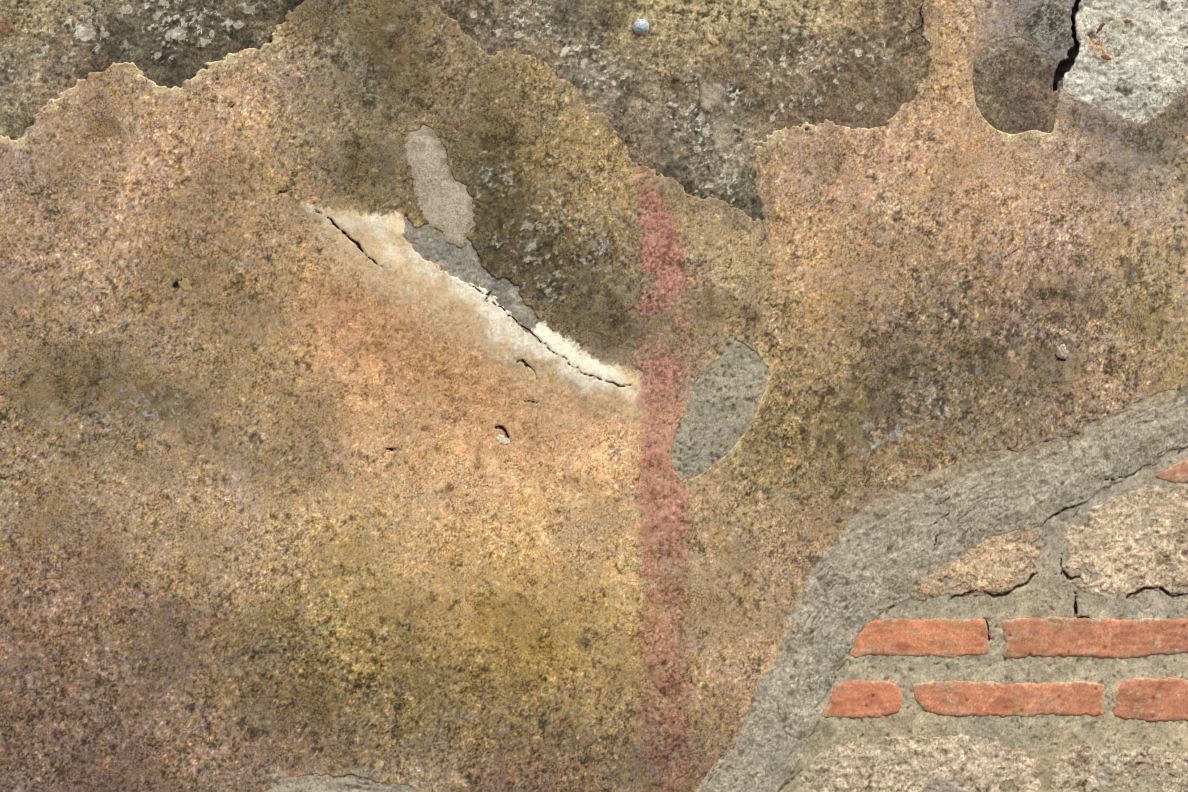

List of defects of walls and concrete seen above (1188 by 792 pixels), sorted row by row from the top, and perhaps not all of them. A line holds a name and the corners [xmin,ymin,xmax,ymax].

peeling [0,0,304,140]
peeling [432,0,931,221]
crack [1053,0,1081,90]
spalling [972,0,1188,134]
spalling [403,216,539,332]
water stain [307,204,647,415]
crack [473,286,631,387]
spalling [1055,344,1069,361]